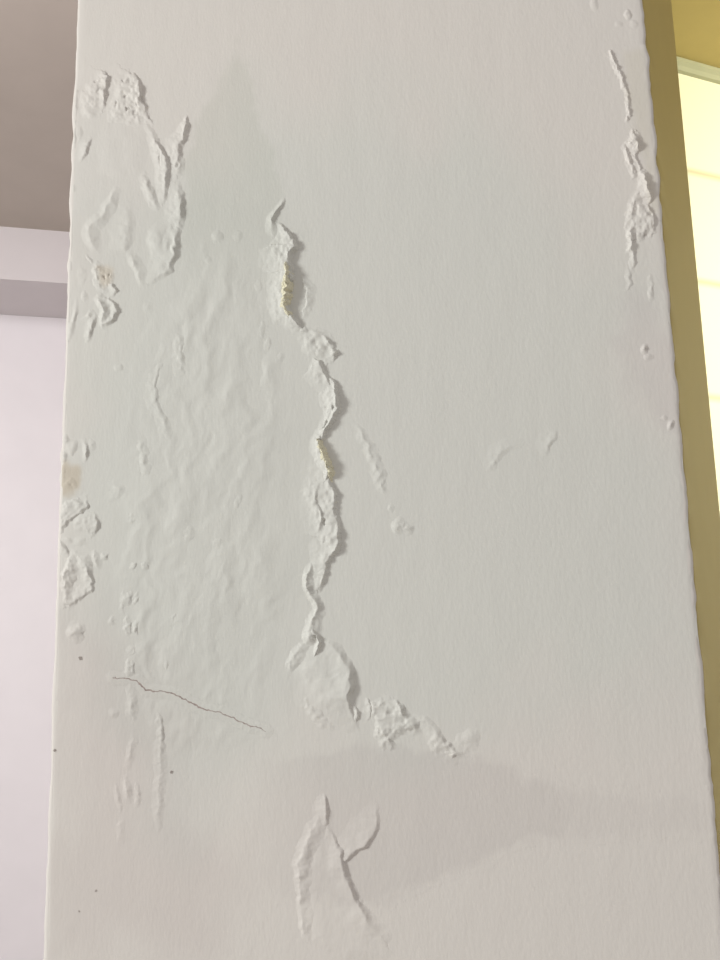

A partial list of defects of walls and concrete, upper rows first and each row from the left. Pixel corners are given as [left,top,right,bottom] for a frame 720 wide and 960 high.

peeling [73,61,154,181]
peeling [607,49,657,292]
peeling [67,254,121,344]
peeling [59,433,109,611]